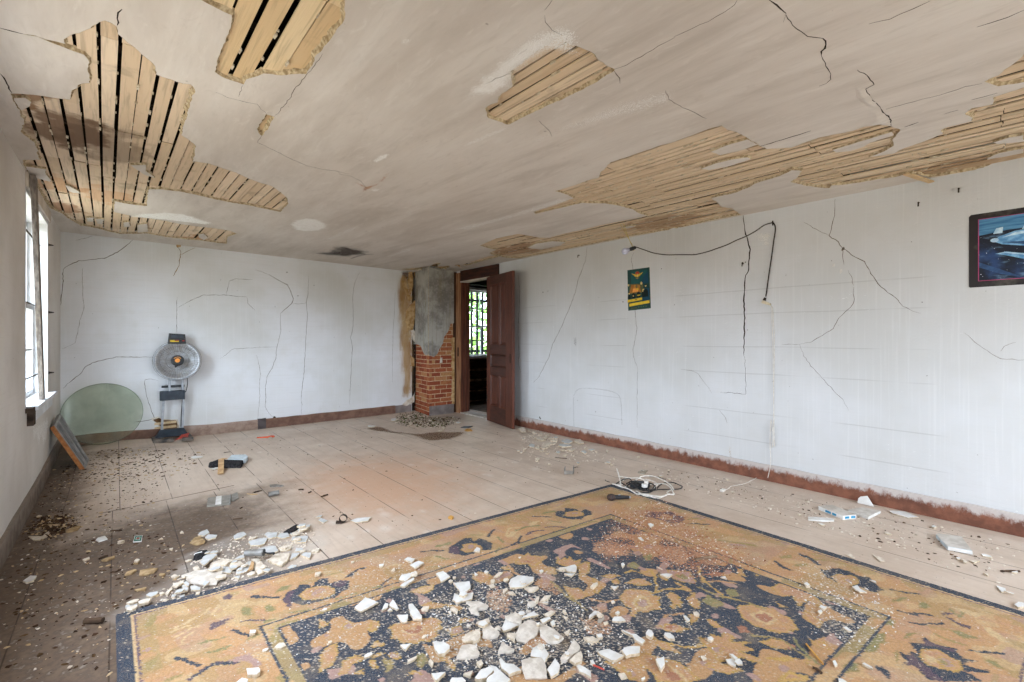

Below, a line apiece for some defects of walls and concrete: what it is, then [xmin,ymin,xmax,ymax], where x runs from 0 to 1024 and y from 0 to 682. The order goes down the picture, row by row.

flaking render [11,20,288,248]
flaking render [202,0,345,84]
flaking render [485,35,615,125]
flaking render [464,55,1024,266]
crack [769,0,831,85]
crack [860,72,996,127]
crack [61,236,131,348]
crack [176,272,309,420]
crack [392,276,416,410]
flaking render [400,263,449,367]
crack [683,217,751,422]
crack [784,210,918,404]